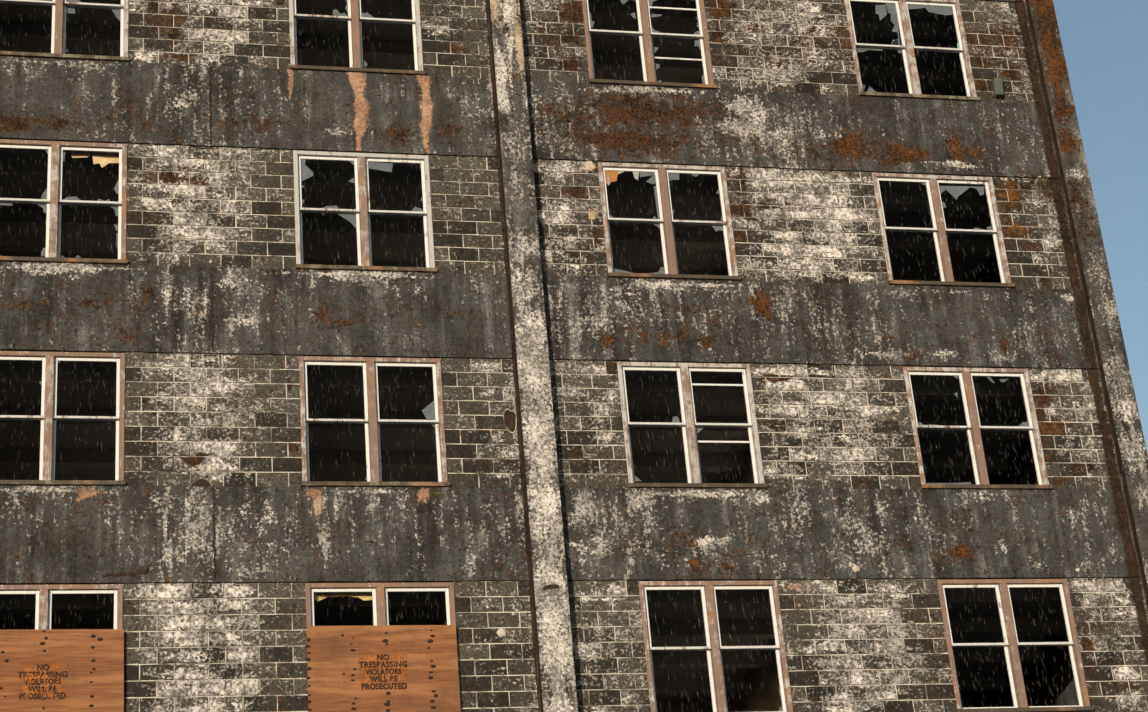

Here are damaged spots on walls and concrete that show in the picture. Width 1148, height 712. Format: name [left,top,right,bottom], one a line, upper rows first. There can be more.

corrosion [348,72,371,151]
corrosion [417,75,433,153]
corrosion [1015,0,1148,664]